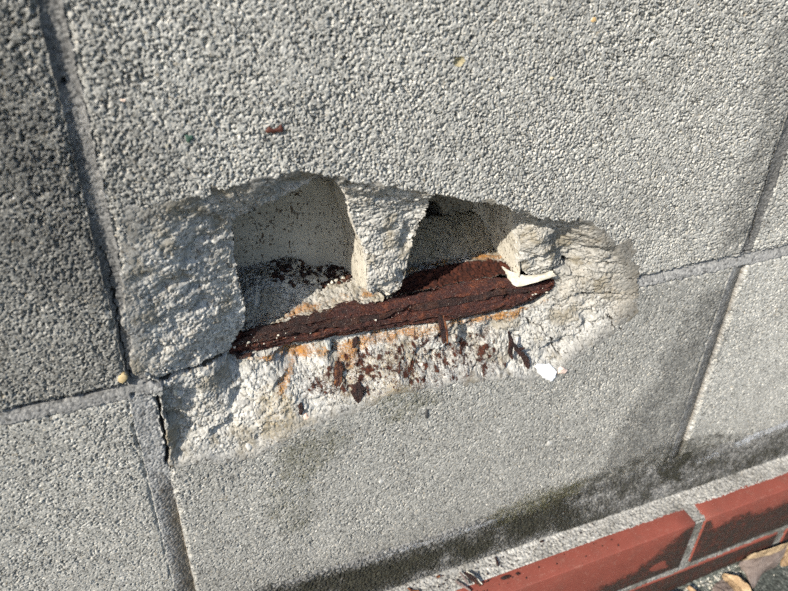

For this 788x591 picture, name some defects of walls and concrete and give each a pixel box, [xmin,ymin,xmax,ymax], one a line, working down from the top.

crack [63,246,228,468]
spalling [118,169,641,469]
corrosion [229,254,555,415]
water stain [265,405,788,591]